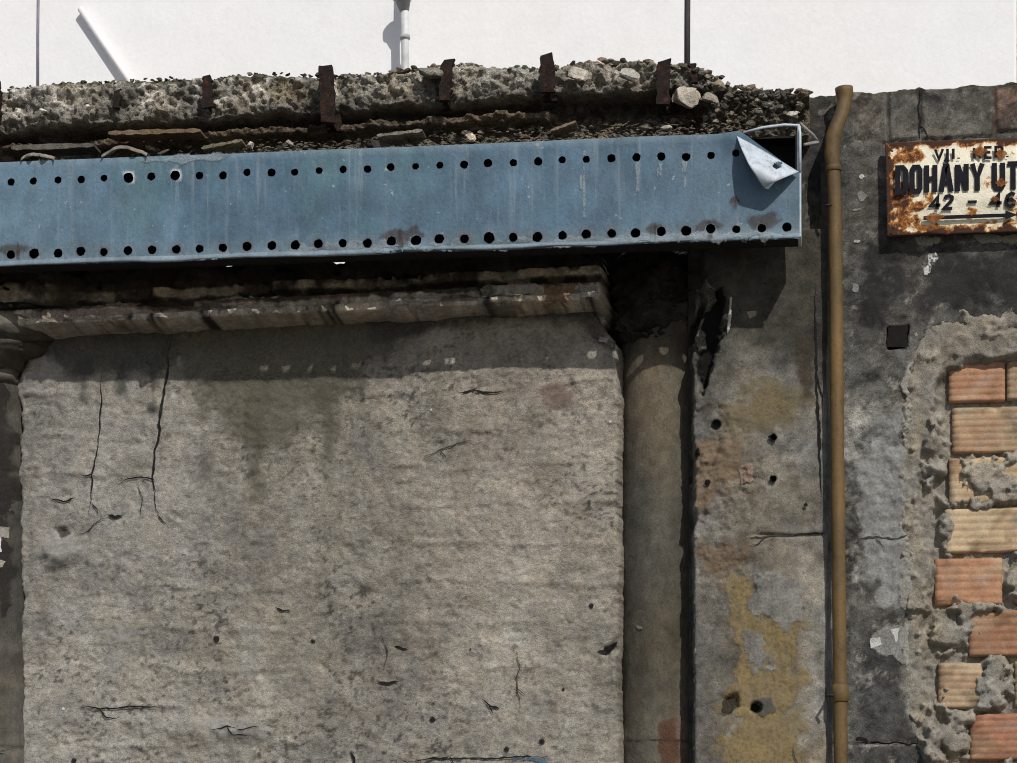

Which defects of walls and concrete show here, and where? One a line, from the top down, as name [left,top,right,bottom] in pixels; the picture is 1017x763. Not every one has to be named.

water stain [525,312,610,345]
spalling [693,279,732,388]
spalling [887,325,908,350]
crack [52,334,172,534]
water stain [46,315,506,494]
spalling [900,361,913,469]
spalling [748,570,809,631]
spalling [742,629,776,674]
crack [86,706,160,719]
spalling [722,697,738,714]
spalling [750,697,777,716]